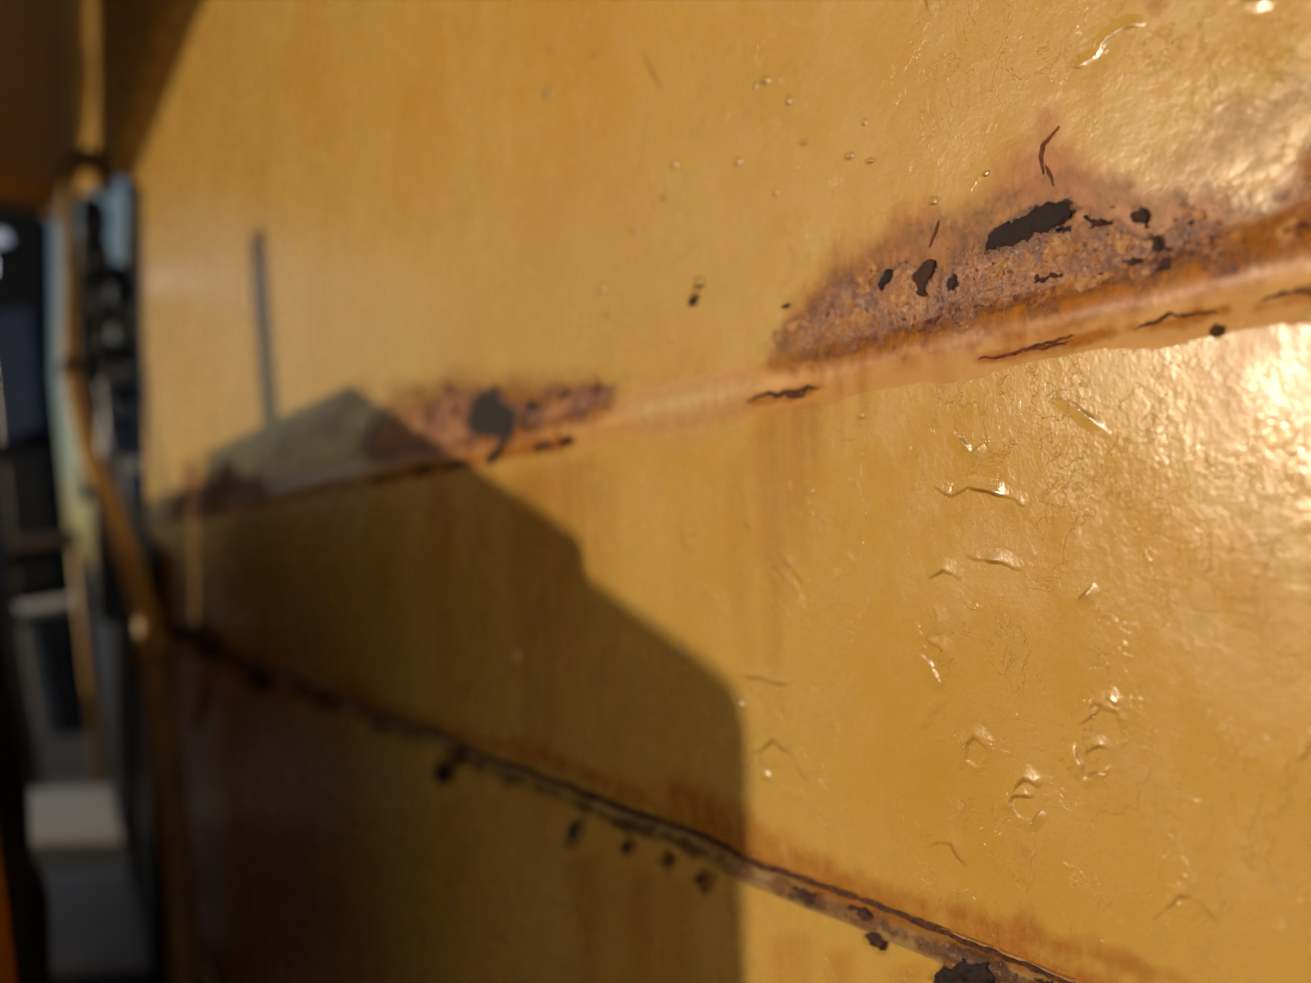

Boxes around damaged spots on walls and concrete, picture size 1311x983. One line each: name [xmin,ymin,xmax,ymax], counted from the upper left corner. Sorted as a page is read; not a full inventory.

corrosion [778,143,1311,362]
corrosion [366,381,612,464]
corrosion [577,800,1092,983]